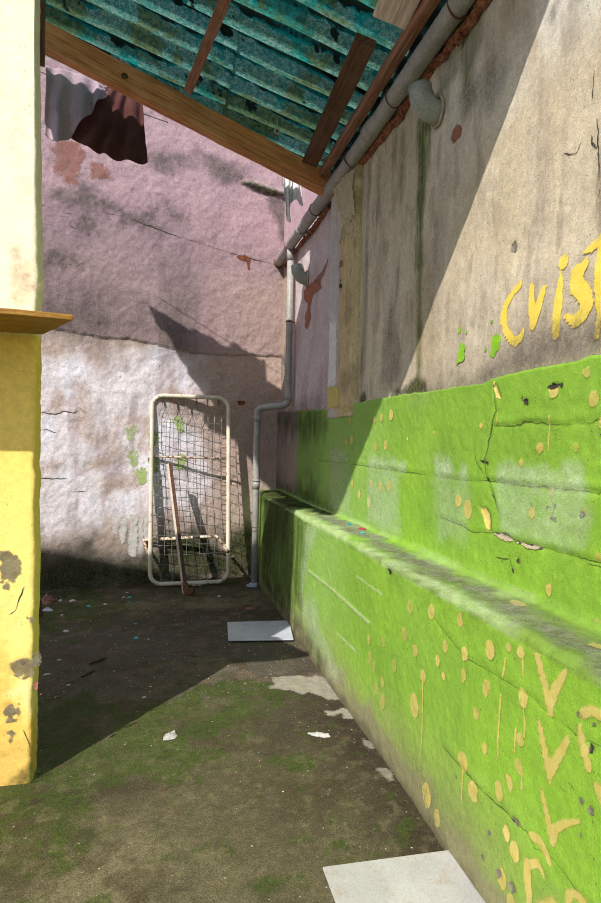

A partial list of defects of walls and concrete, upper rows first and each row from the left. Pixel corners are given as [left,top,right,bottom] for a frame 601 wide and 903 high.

flaking render [452,124,461,143]
crack [563,69,600,197]
flaking render [304,259,328,330]
crack [41,407,86,433]
crack [318,389,601,567]
flaking render [481,507,540,550]
peeling [0,550,21,590]
peeling [10,652,42,695]